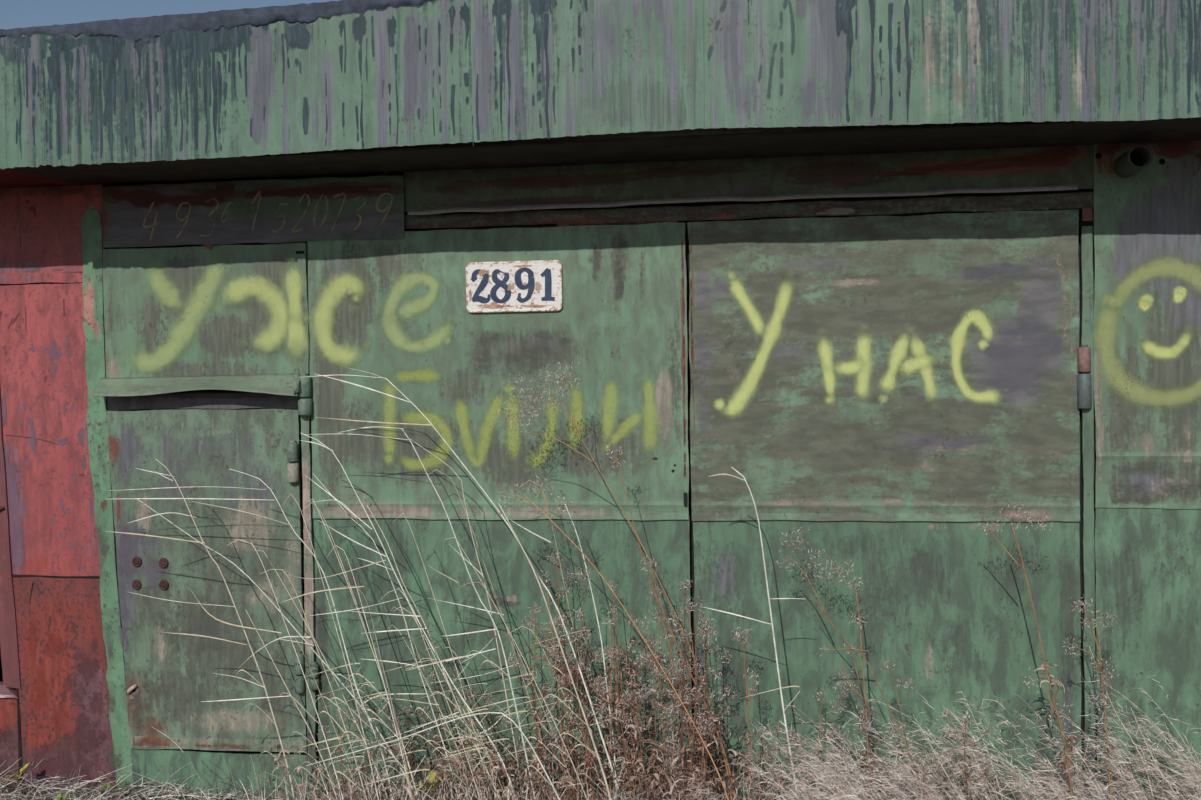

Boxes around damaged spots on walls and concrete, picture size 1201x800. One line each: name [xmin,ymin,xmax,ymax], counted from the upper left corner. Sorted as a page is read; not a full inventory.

peeling [795,0,863,121]
corrosion [100,494,173,652]